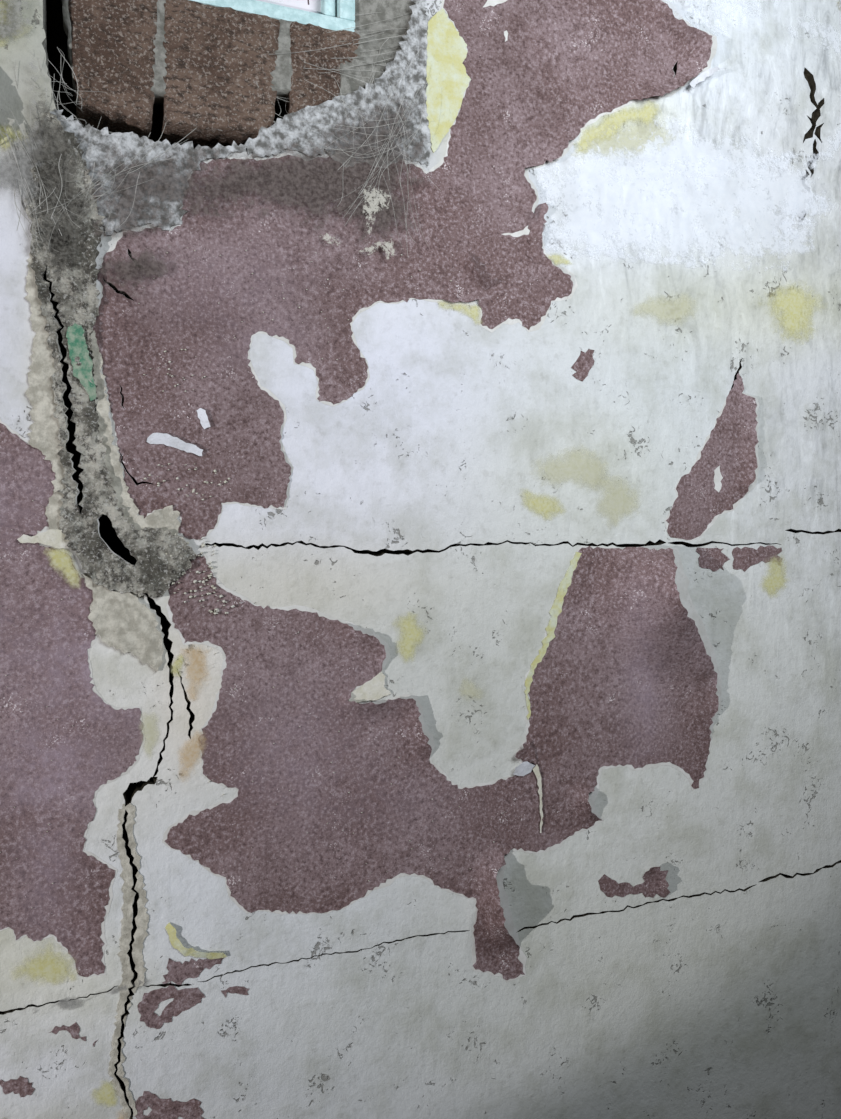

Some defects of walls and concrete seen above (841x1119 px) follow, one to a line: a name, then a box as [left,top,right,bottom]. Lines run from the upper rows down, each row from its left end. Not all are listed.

crack [43,230,137,566]
peeling [0,0,728,982]
crack [205,529,841,556]
peeling [665,373,760,541]
flaking render [108,803,149,1119]
crack [0,593,470,1119]
crack [516,860,841,933]